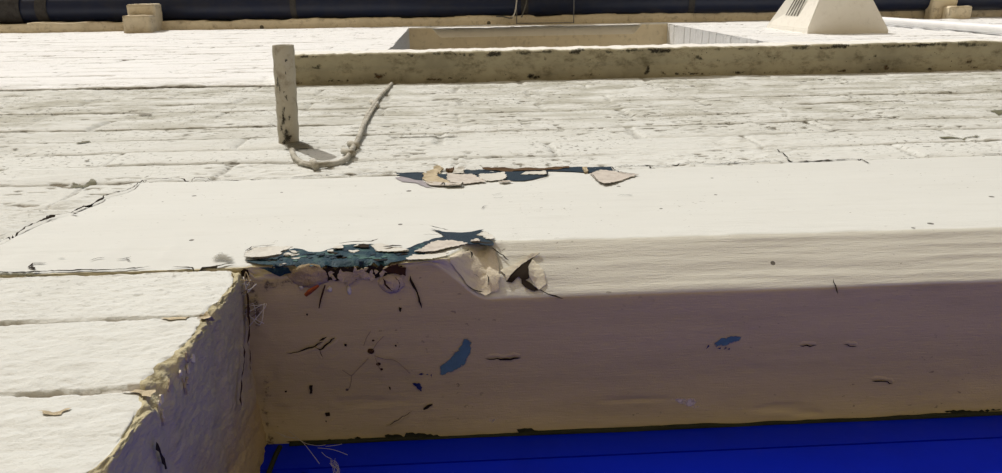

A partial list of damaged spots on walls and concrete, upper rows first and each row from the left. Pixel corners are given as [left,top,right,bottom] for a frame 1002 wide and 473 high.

crack [7,172,382,239]
peeling [395,165,638,188]
crack [0,257,148,273]
peeling [241,226,495,286]